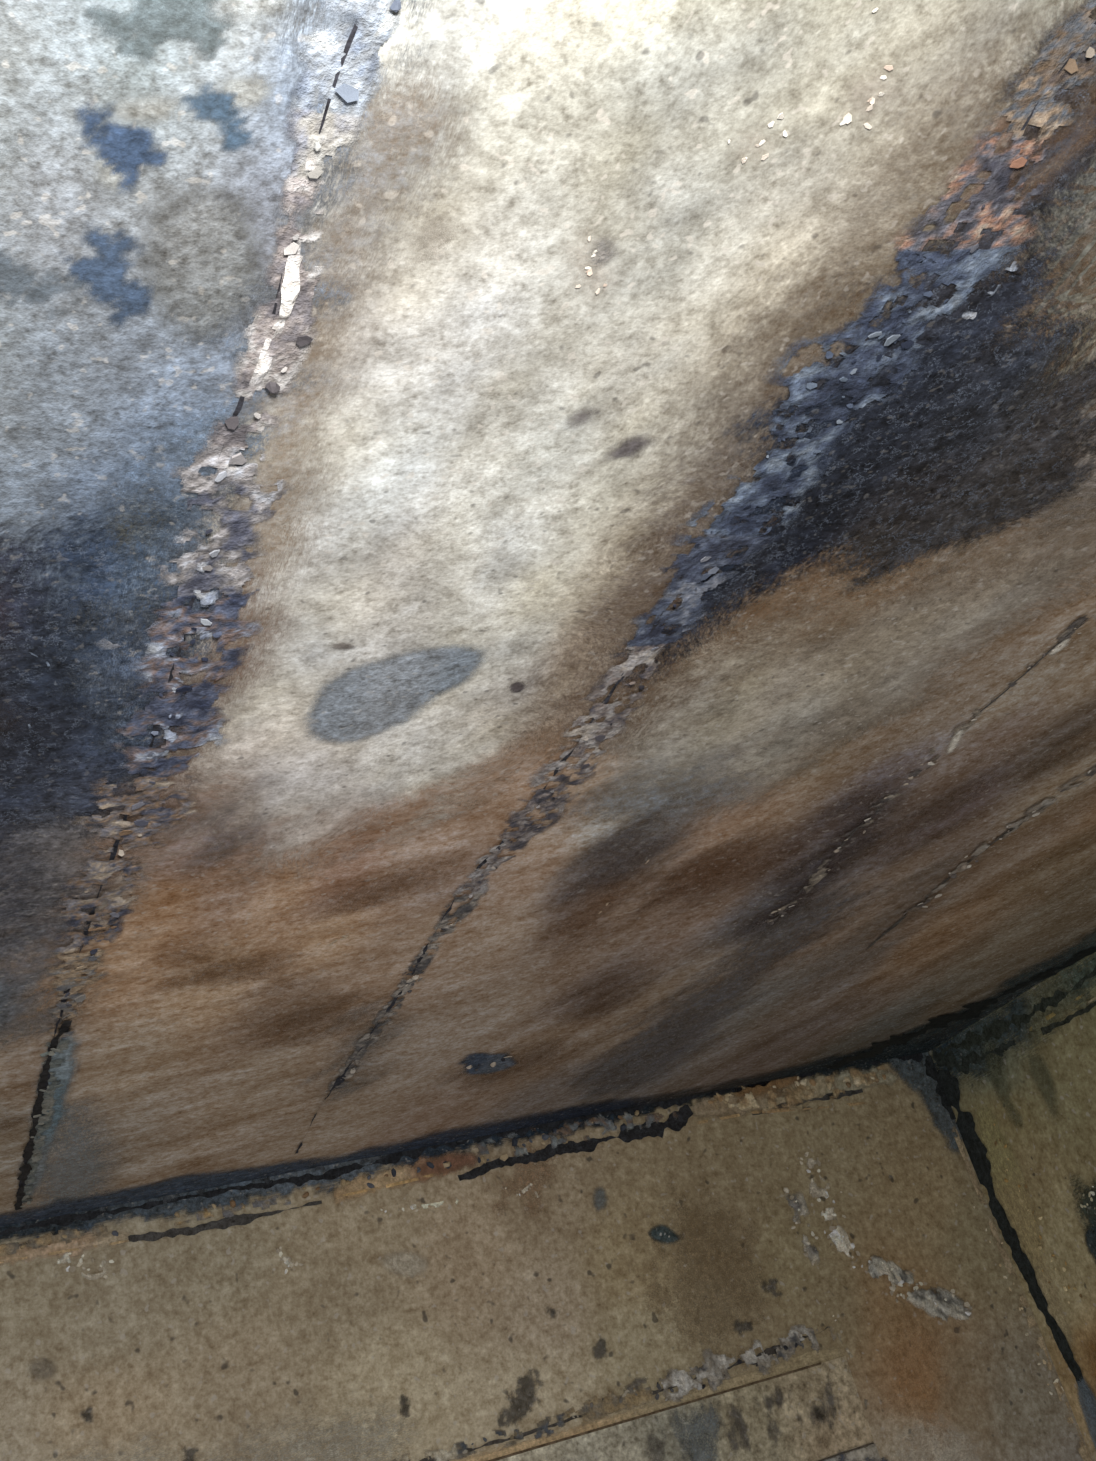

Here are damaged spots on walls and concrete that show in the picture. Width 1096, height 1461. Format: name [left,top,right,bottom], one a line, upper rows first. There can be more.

spalling [840,65,893,129]
leakage [0,0,363,609]
peeling [144,188,267,338]
corrosion [181,84,458,716]
crack [14,0,424,1210]
crack [295,0,1096,1154]
leakage [0,553,1096,1227]
spalling [0,1230,128,1280]
spalling [302,1133,545,1213]
spalling [692,1065,897,1124]
peeling [783,1149,973,1321]
spalling [393,1303,853,1461]